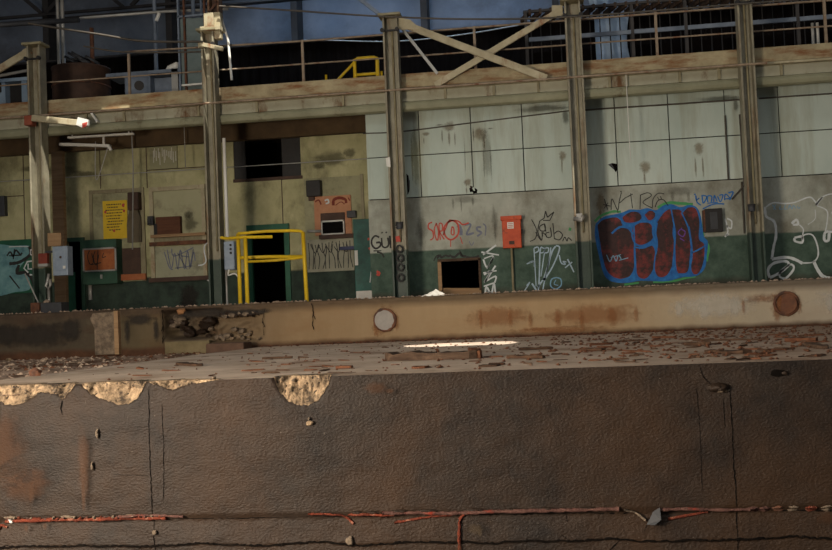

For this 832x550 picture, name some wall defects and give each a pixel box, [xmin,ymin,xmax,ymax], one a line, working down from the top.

spalling [168,308,263,341]
spalling [0,376,221,405]
spalling [273,373,333,405]
crack [0,366,832,550]